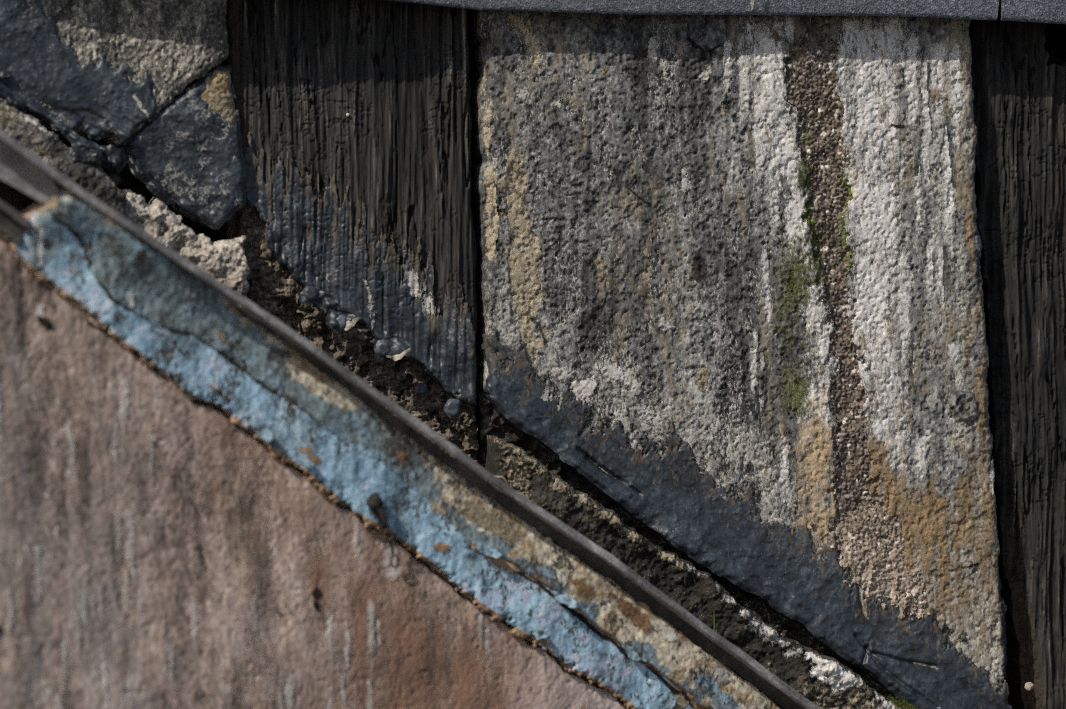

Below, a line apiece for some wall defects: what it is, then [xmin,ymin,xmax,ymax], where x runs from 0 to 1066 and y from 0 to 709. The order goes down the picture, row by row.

crack [51,213,339,440]
flaking render [481,89,668,443]
crack [577,299,606,329]
water stain [689,253,705,282]
water stain [723,15,963,516]
flaking render [784,16,931,620]
crack [192,385,631,709]
flaking render [499,443,639,542]
crack [468,545,706,709]
peeling [609,592,678,641]
flaking render [655,547,700,575]
flaking render [717,584,893,709]